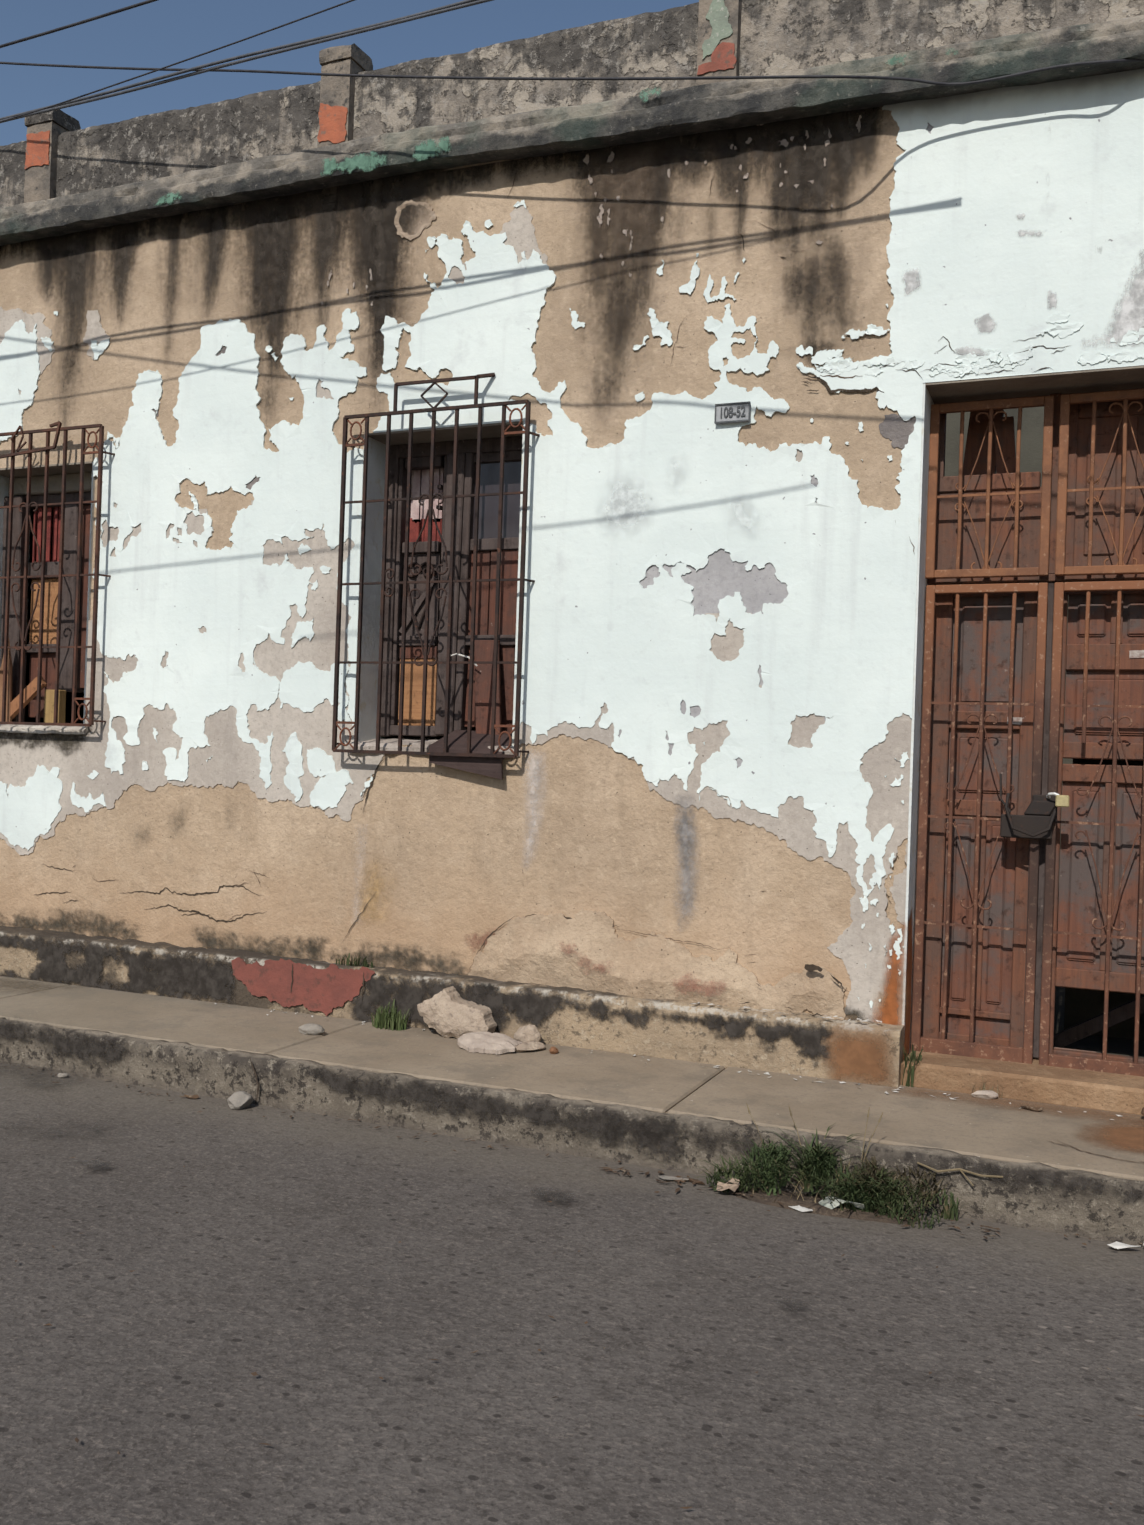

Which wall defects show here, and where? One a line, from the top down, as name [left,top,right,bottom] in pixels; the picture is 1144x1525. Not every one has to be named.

damp [0,107,879,364]
peeling [0,103,1084,510]
peeling [1077,328,1144,365]
spalling [100,503,141,557]
peeling [166,476,261,550]
spalling [0,524,912,1025]
crack [34,864,269,922]
damp [0,934,235,1003]